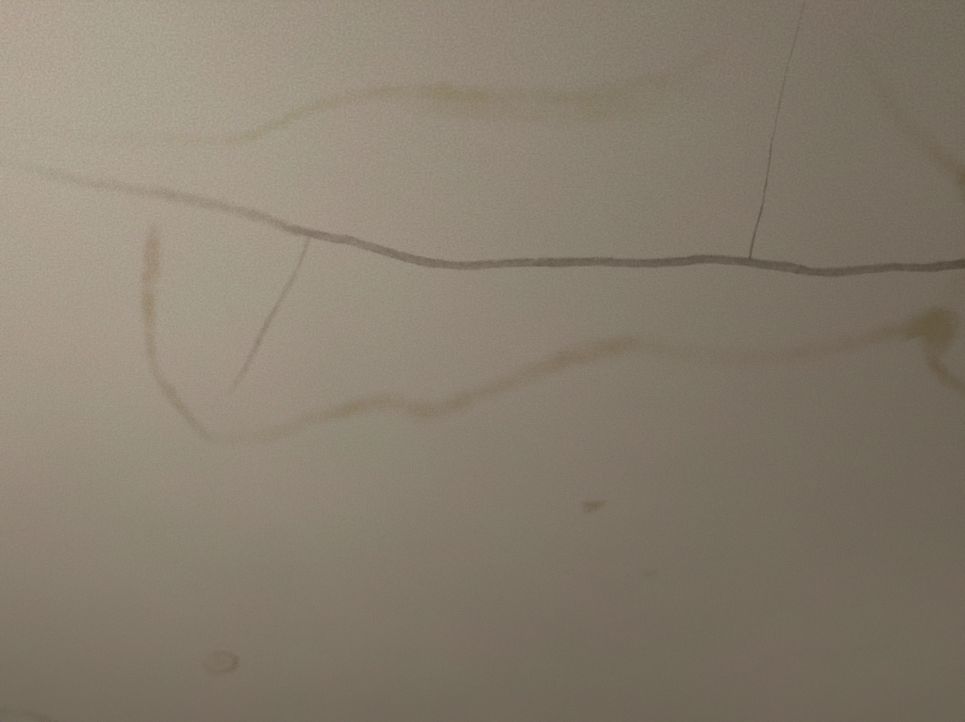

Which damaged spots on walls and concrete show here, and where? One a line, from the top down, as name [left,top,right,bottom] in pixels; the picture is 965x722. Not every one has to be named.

crack [1,2,965,391]